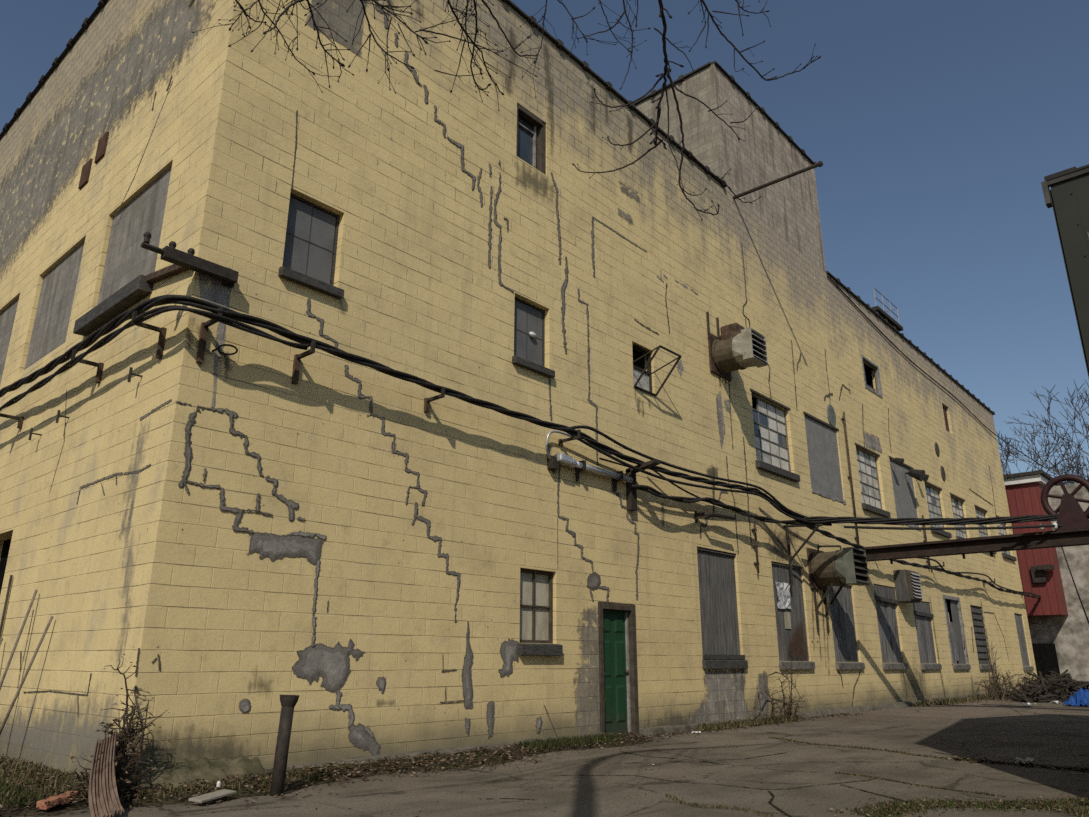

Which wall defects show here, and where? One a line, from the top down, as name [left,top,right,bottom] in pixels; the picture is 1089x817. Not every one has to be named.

spalling [307,0,367,56]
crack [375,1,514,293]
crack [551,172,647,602]
crack [76,464,151,504]
crack [140,399,305,534]
crack [306,298,461,623]
spalling [247,531,381,755]
spalling [461,621,474,736]
spalling [486,701,495,739]
spalling [498,638,519,677]